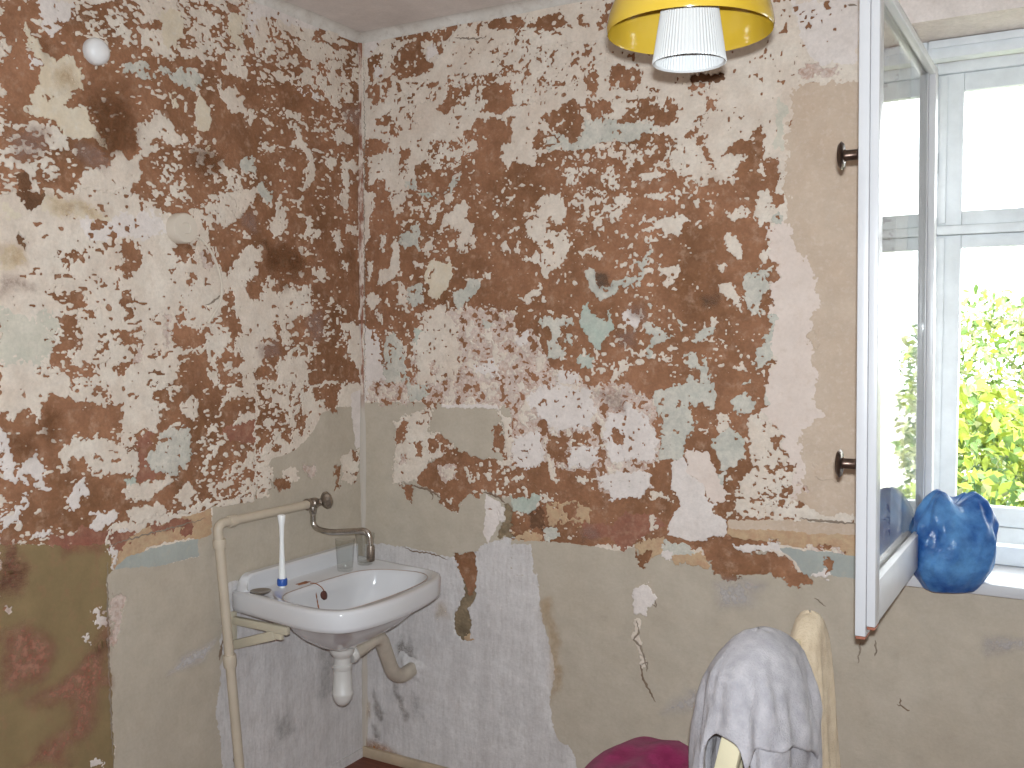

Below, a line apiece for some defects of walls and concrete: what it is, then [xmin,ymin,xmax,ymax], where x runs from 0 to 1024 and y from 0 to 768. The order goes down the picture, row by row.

flaking render [0,0,847,589]
spalling [454,551,478,641]
spalling [631,582,657,668]
crack [633,601,657,702]
crack [857,640,878,663]